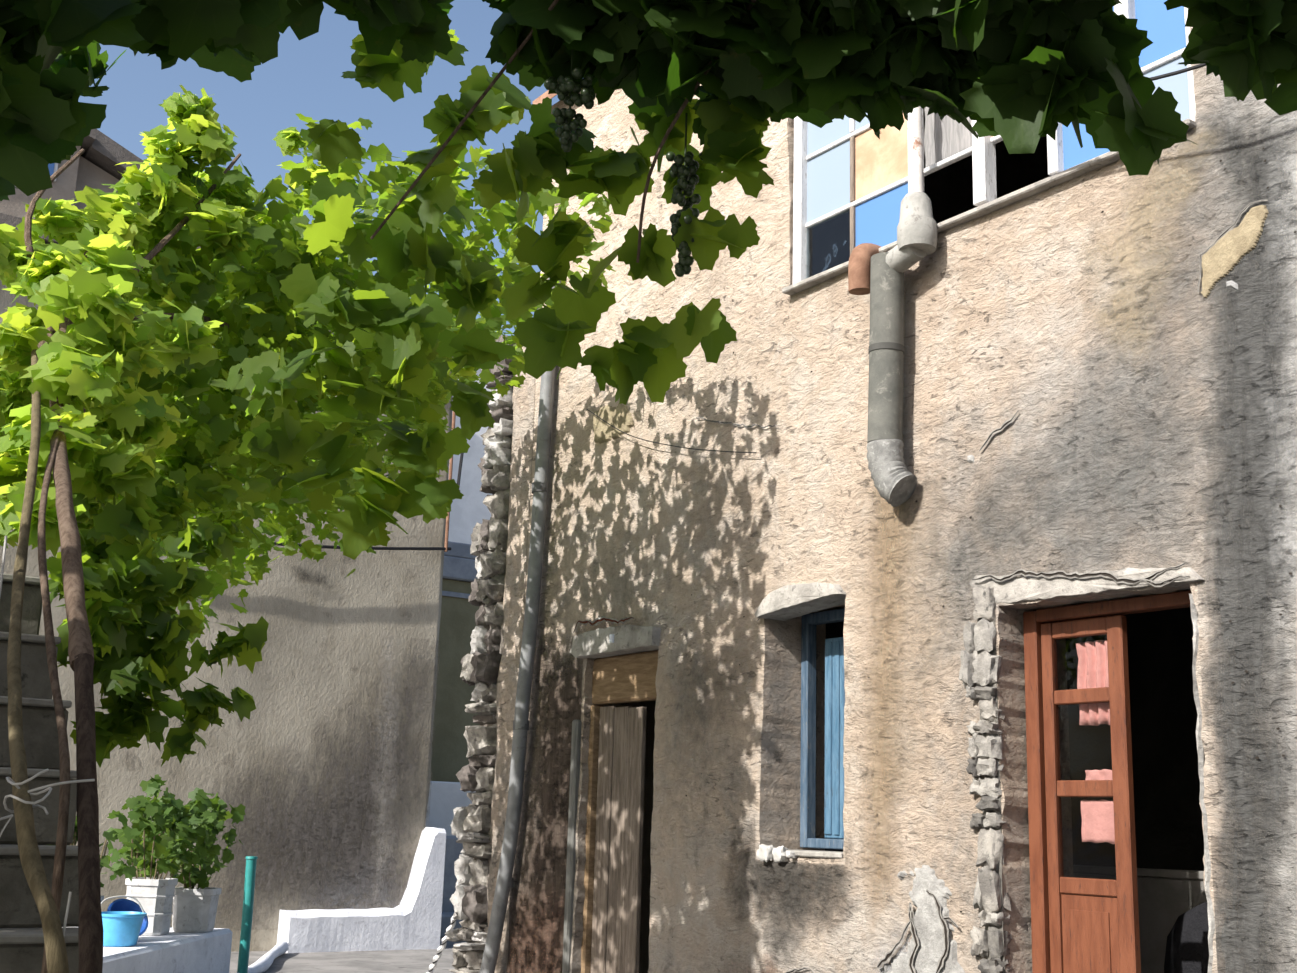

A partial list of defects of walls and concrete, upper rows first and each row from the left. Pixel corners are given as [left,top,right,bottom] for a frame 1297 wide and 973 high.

peeling [1198,200,1269,298]
crack [972,562,1189,587]
leakage [734,829,844,951]